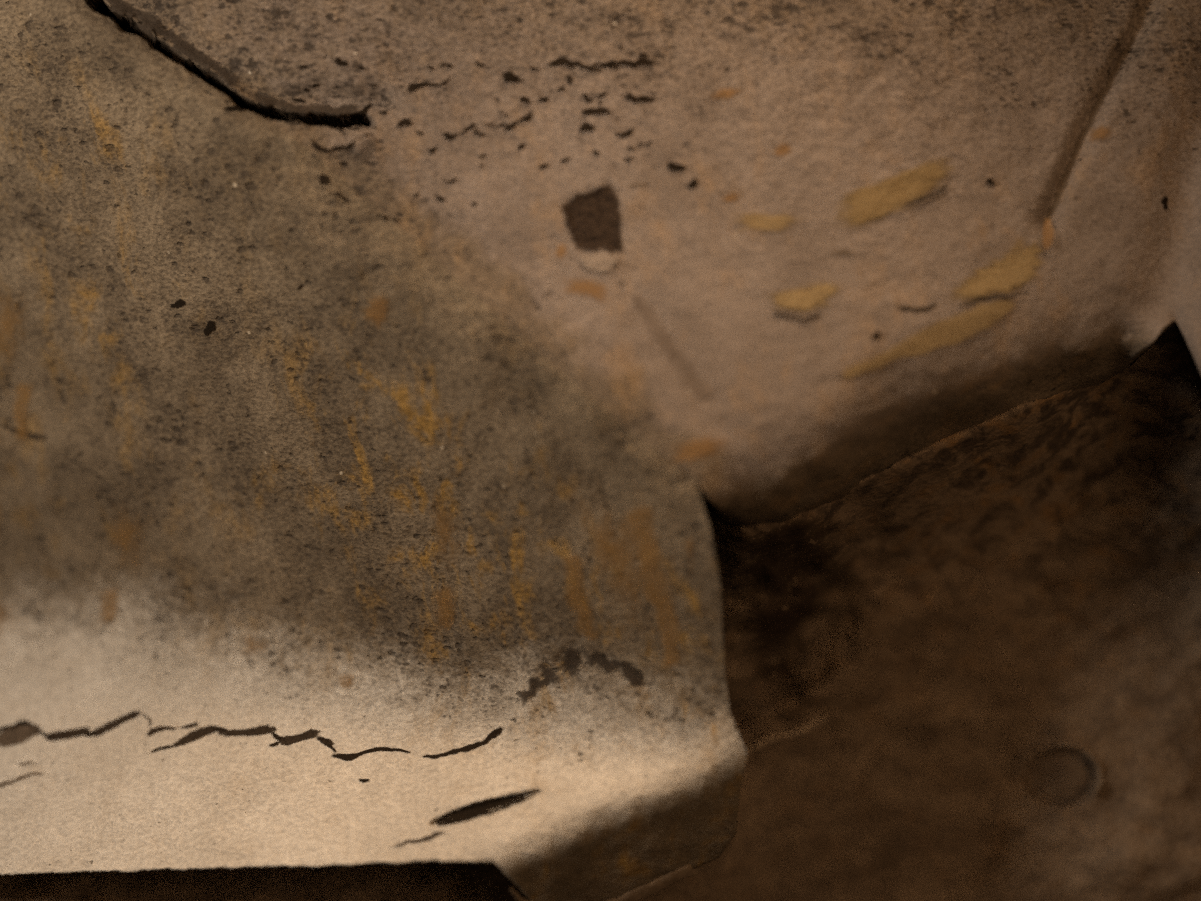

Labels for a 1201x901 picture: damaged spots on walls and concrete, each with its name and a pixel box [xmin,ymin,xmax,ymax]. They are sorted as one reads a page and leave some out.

crack [84,0,656,222]
spalling [502,70,523,83]
spalling [667,162,697,188]
peeling [840,158,953,224]
spalling [557,184,623,299]
peeling [953,219,1054,307]
peeling [772,283,839,321]
crack [0,711,502,787]